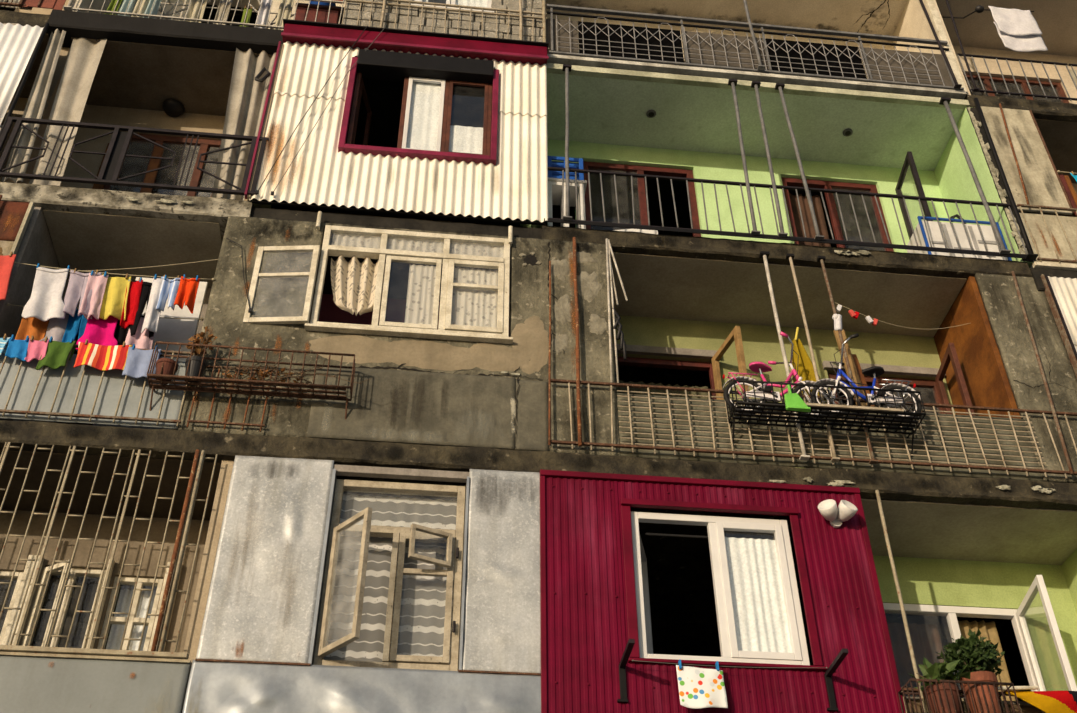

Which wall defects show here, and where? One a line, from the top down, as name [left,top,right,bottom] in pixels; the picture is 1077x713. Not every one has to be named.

crack [853,0,890,33]